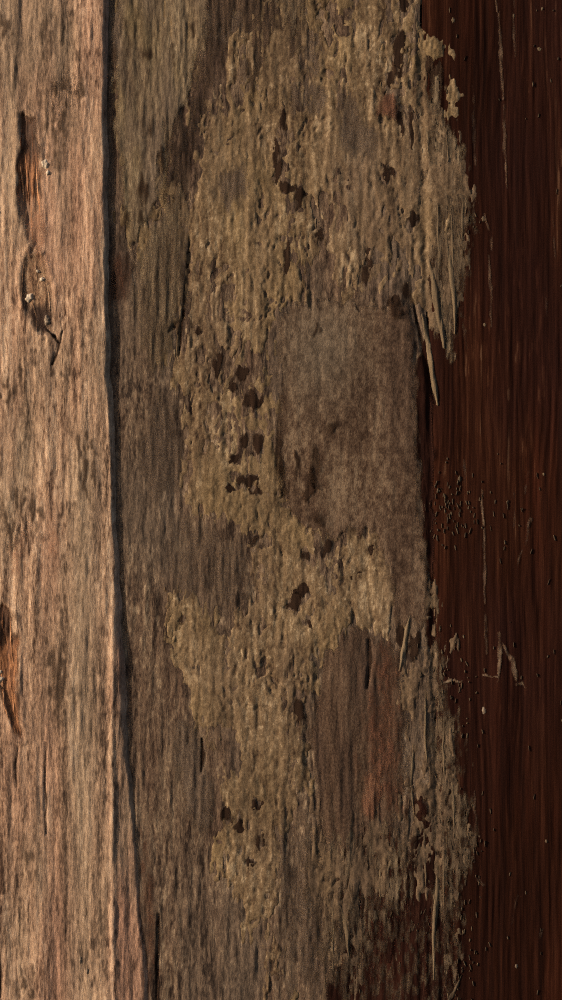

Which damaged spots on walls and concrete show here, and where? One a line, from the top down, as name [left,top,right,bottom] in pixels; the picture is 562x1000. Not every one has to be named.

peeling [225,25,259,92]
spalling [364,30,406,109]
peeling [418,28,464,121]
spalling [395,111,414,150]
spalling [272,109,306,210]
peeling [347,235,373,287]
crack [45,327,63,365]
spalling [227,365,263,412]
spalling [228,432,264,464]
spalling [225,475,262,495]
peeling [275,283,460,855]
spalling [220,806,244,833]